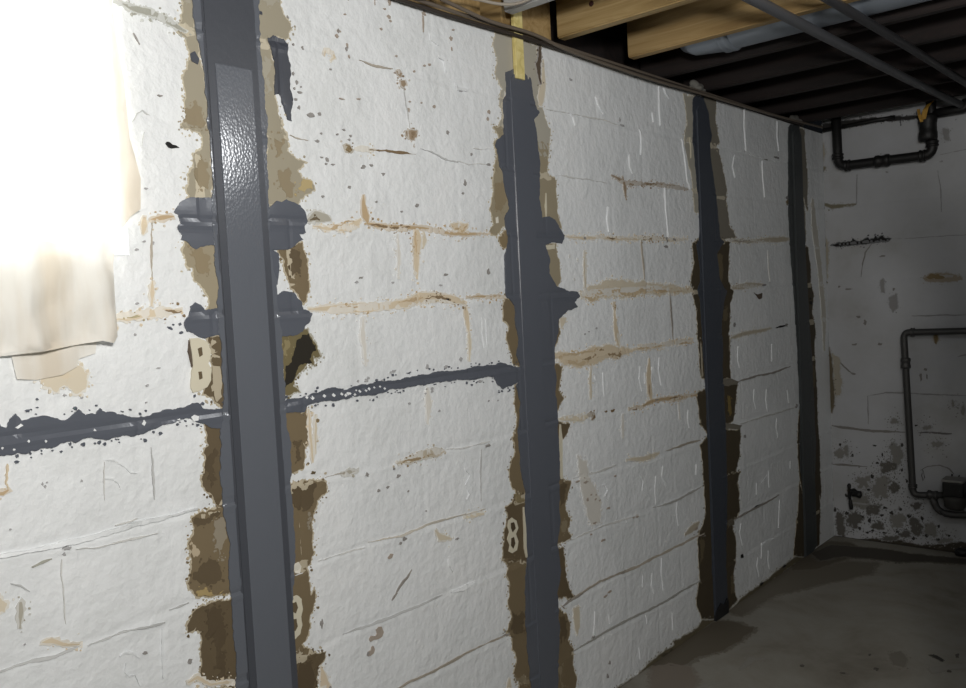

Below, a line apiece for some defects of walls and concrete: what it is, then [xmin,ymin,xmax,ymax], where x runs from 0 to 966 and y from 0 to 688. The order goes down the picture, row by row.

peeling [197,335,224,409]
peeling [501,294,519,367]
peeling [486,31,562,250]
peeling [546,243,575,287]
peeling [682,93,746,620]
peeling [184,424,236,688]
peeling [286,405,332,688]
leakage [646,407,966,688]